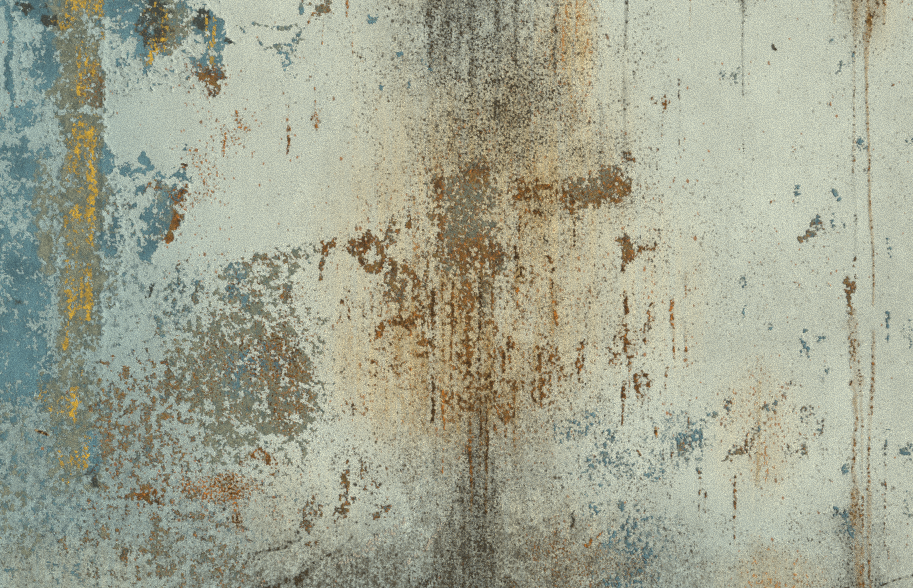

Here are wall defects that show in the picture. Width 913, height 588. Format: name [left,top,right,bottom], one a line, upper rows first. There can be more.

damp [407,0,613,260]
corrosion [852,0,887,286]
corrosion [172,433,287,532]
corrosion [158,245,333,446]
peeling [0,0,638,588]
corrosion [333,170,656,513]
damp [379,397,661,588]
corrosion [842,309,875,588]